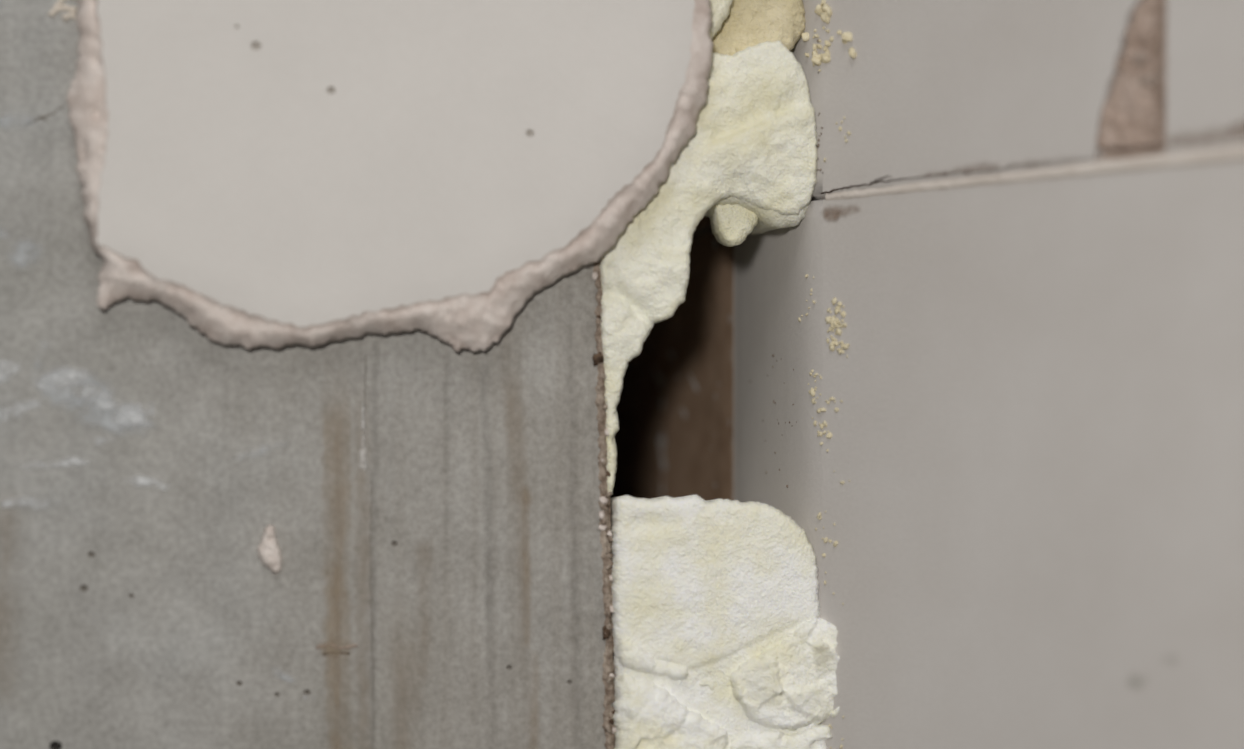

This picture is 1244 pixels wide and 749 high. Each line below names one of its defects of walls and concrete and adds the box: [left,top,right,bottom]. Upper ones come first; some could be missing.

spalling [1097,0,1166,150]
crack [820,158,1084,194]
efflorescence [39,370,142,441]
spalling [592,259,617,749]